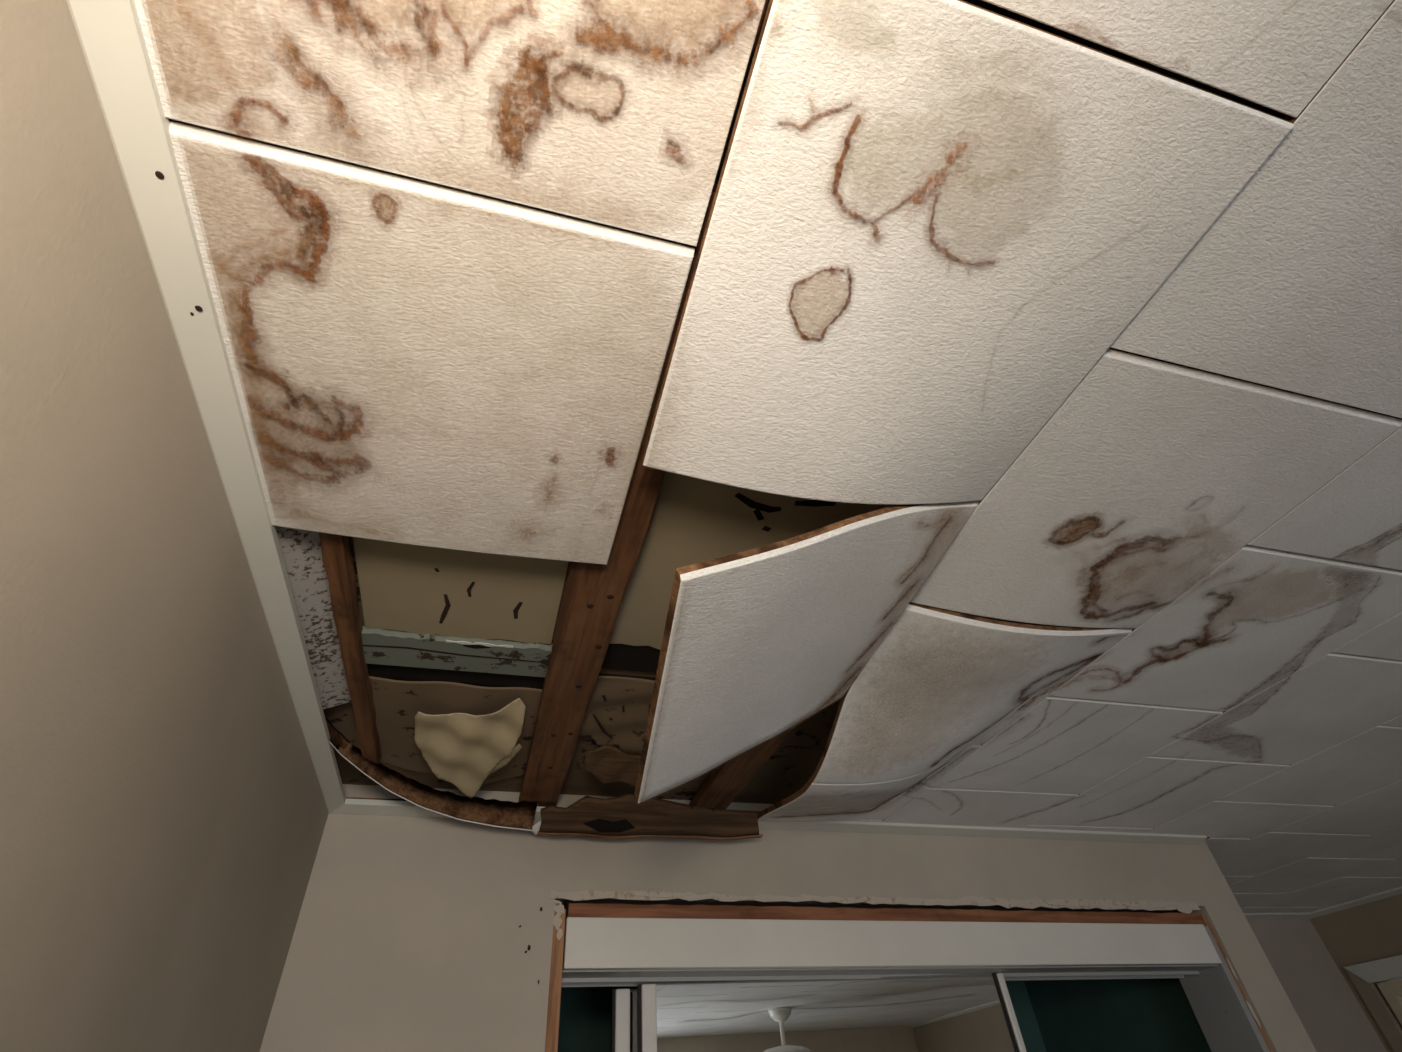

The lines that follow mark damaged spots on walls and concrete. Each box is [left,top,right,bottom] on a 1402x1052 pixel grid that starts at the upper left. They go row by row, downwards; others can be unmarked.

leakage [273,32,360,137]
leakage [372,194,397,223]
leakage [312,0,535,62]
leakage [496,45,625,164]
leakage [575,0,759,66]
leakage [666,139,684,163]
leakage [778,103,995,266]
leakage [230,97,371,483]
leakage [789,267,852,341]
spalling [275,526,763,841]
leakage [780,516,1240,817]